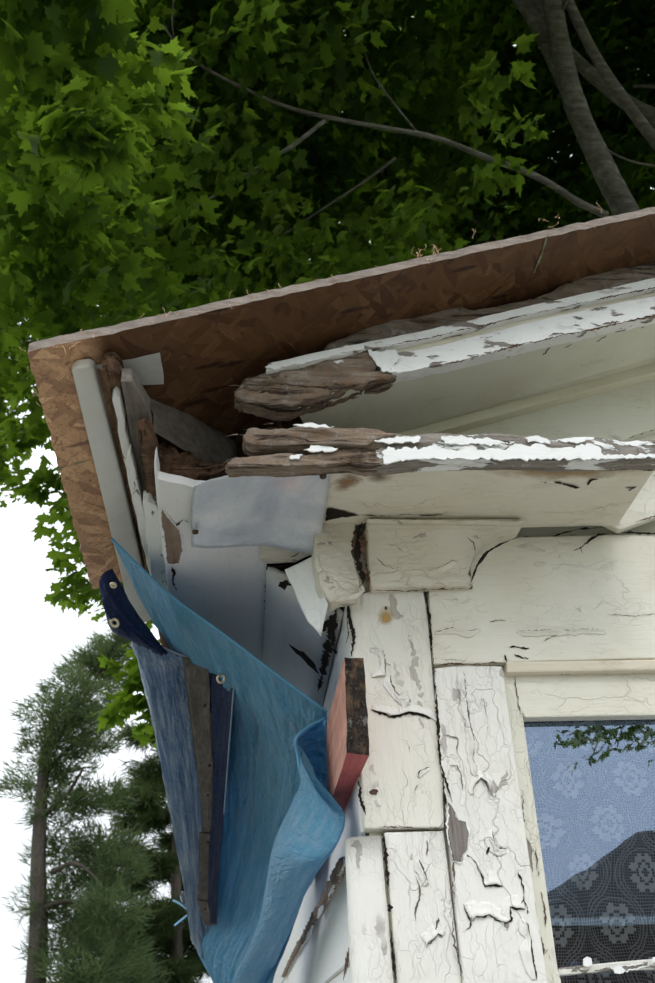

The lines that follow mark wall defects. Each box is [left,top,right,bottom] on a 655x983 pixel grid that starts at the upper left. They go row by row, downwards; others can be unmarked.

peeling [265,344,400,374]
peeling [289,445,338,460]
peeling [375,435,655,465]
crack [540,476,599,489]
peeling [159,509,184,564]
crack [317,514,655,981]
peeling [306,858,345,943]